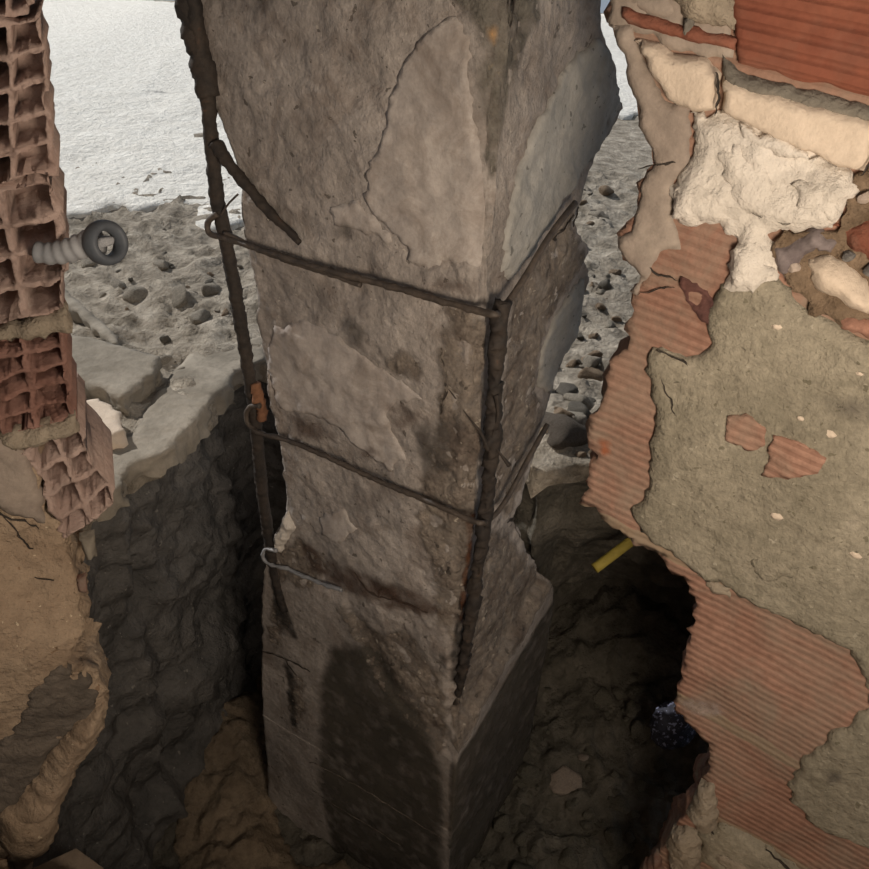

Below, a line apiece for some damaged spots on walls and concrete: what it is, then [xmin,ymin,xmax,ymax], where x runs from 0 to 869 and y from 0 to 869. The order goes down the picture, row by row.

peeling [330,0,541,270]
crack [0,512,39,549]
peeling [0,439,45,523]
crack [262,651,310,676]
rust [285,665,296,726]
spalling [273,511,328,588]
peeling [267,320,422,472]
damp [321,603,554,869]
spalling [343,534,551,753]
spalling [417,308,486,643]
spalling [466,580,709,869]
peeling [495,0,869,848]